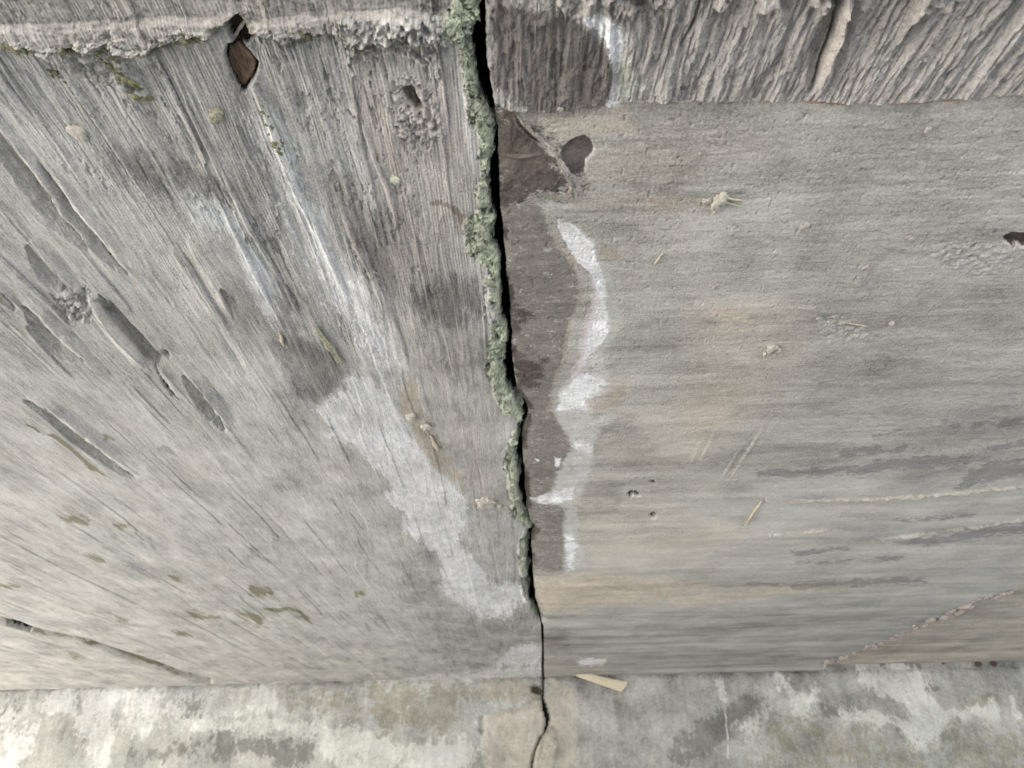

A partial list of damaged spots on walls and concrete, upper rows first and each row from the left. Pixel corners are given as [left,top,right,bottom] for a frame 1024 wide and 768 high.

spalling [226,14,259,90]
water stain [88,0,645,630]
crack [472,0,549,767]